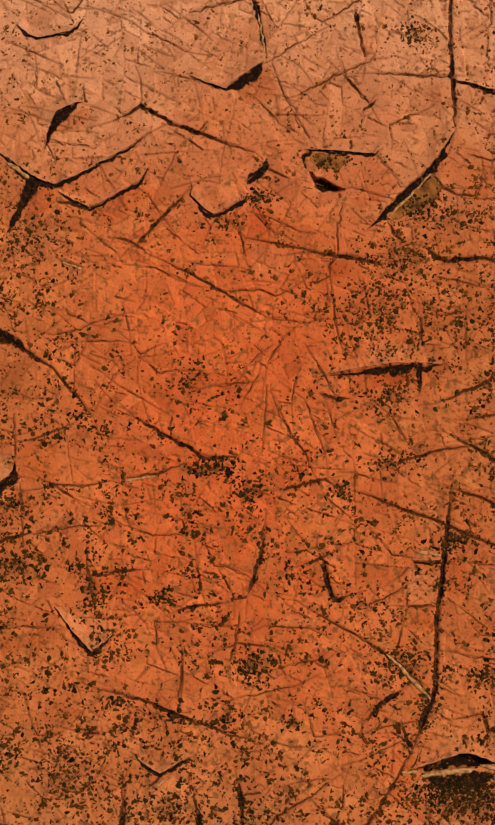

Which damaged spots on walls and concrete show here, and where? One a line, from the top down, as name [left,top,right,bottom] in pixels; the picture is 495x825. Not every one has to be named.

peeling [18,14,83,40]
peeling [0,78,148,230]
crack [114,87,255,153]
peeling [176,0,267,91]
peeling [191,158,289,218]
spalling [311,177,338,192]
crack [260,0,457,139]
peeling [369,118,455,228]
crack [101,196,303,324]
crack [218,341,350,491]
crack [154,525,265,661]
crack [269,474,495,825]